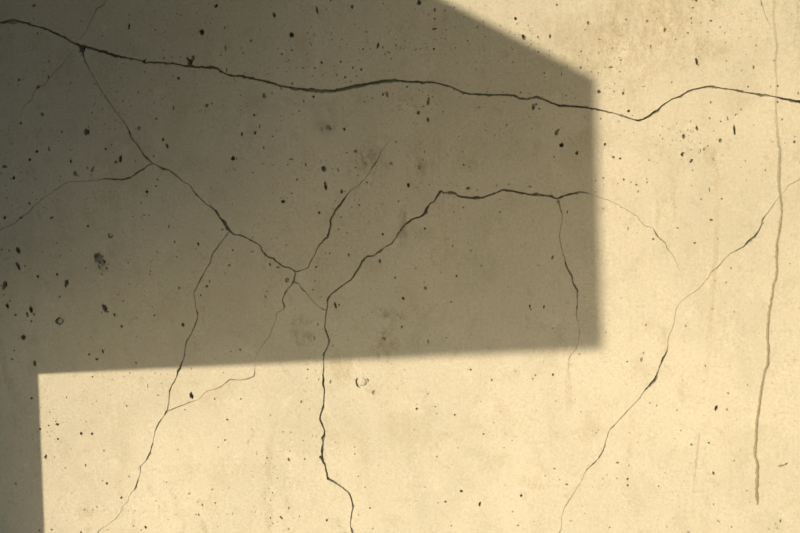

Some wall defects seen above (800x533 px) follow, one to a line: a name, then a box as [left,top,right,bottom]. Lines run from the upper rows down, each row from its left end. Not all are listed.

crack [0,19,800,122]
crack [0,116,678,533]
crack [559,178,800,533]